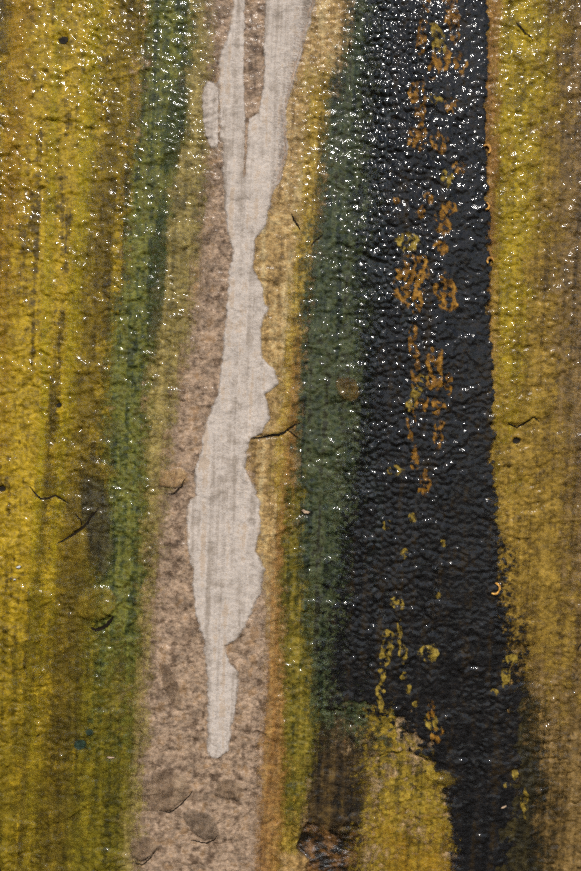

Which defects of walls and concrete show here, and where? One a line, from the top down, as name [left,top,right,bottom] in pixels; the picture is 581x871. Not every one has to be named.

damp [112,0,141,59]
crack [29,486,98,543]
damp [40,73,133,871]
damp [129,0,321,871]
crack [251,422,301,439]
damp [312,0,581,871]